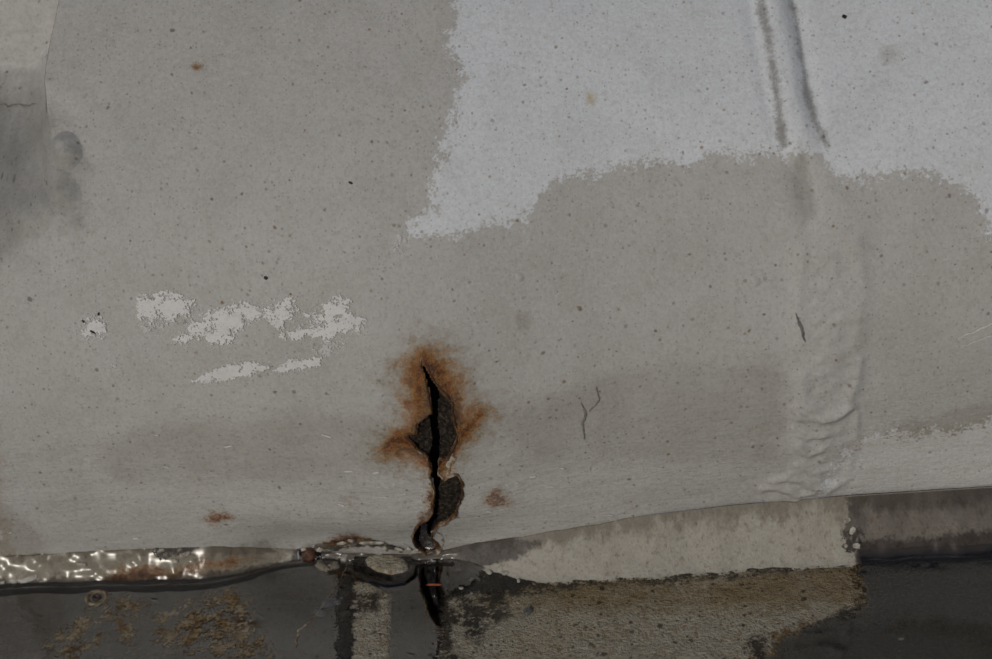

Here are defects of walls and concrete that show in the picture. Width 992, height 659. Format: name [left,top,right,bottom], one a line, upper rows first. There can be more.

peeling [75,312,107,340]
peeling [135,290,367,383]
crack [403,356,464,556]
rust [381,346,493,478]